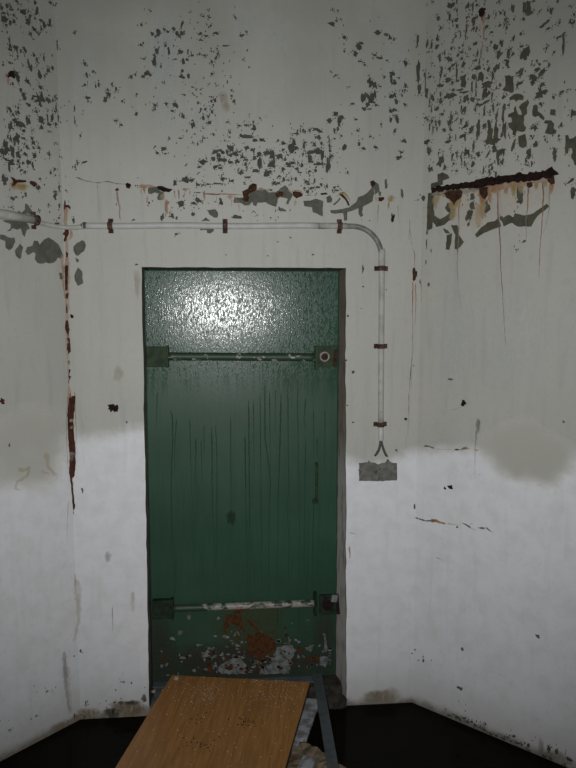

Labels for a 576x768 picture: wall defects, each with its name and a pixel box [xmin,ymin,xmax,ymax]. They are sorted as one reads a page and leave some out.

peeling [0,0,138,264]
spalling [128,0,576,252]
rust [115,183,190,218]
rust [203,183,310,204]
rust [433,176,555,295]
damp [475,420,571,483]
rust [183,609,320,675]
peeling [192,630,332,675]
damp [8,695,150,757]